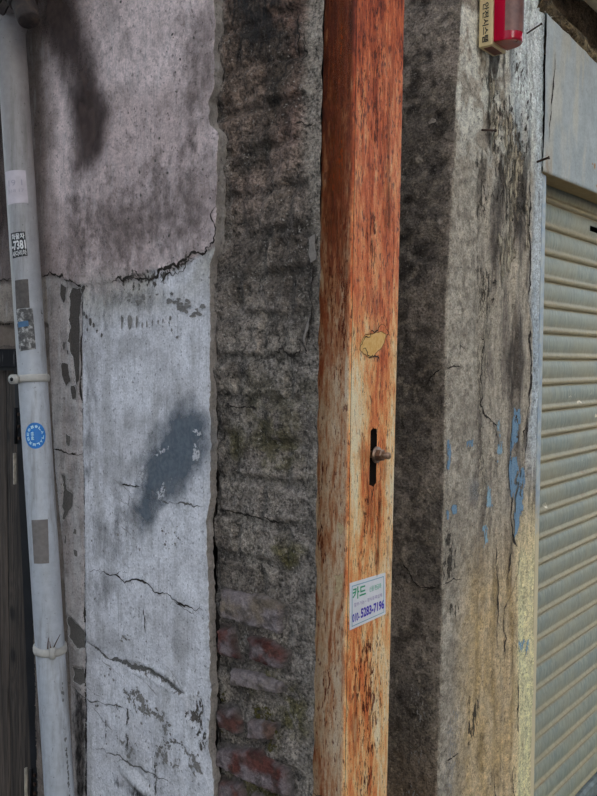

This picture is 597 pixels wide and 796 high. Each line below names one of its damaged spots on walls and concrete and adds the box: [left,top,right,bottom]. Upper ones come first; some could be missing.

water stain [40,0,104,170]
water stain [475,53,533,240]
peeling [60,283,103,400]
peeling [121,292,206,338]
crack [112,206,216,290]
water stain [471,254,497,314]
water stain [136,495,155,525]
crack [122,468,284,574]
crack [84,565,221,671]
spalling [217,586,292,697]
crack [72,604,173,796]
peeling [119,687,206,782]